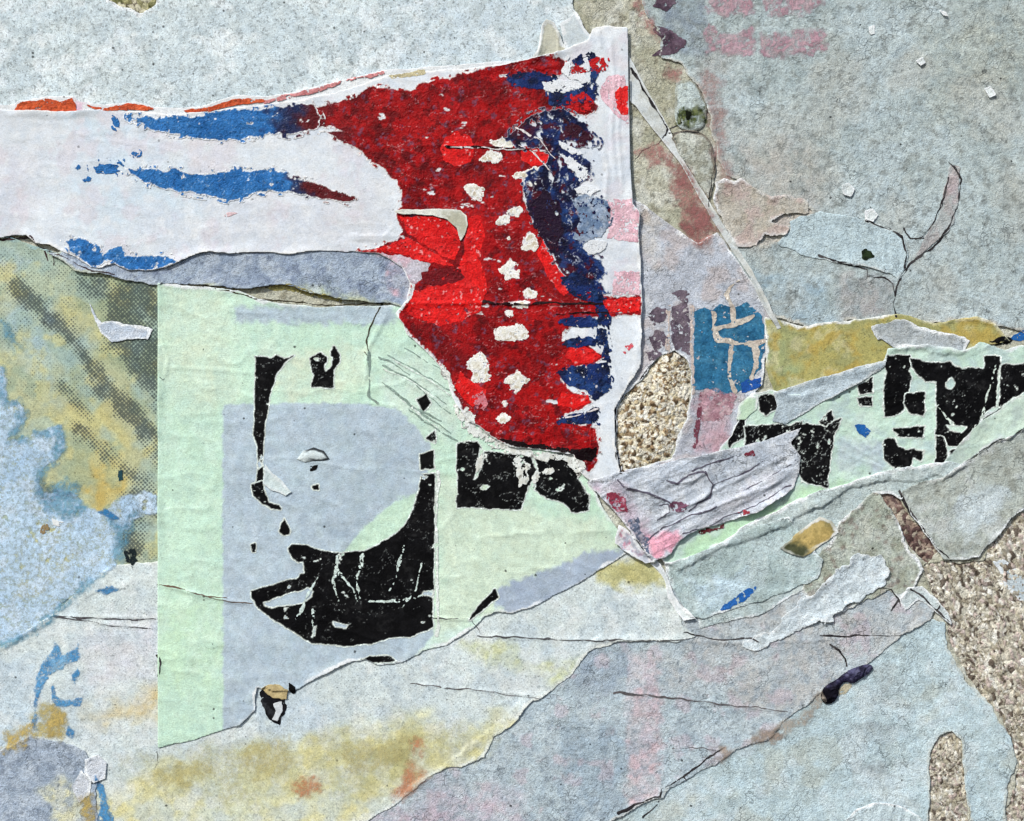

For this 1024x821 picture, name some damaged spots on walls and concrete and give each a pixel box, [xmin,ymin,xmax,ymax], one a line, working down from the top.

spalling [616,351,691,472]
peeling [615,525,657,563]
crack [410,683,550,699]
crack [613,691,788,712]
spalling [880,494,1024,821]
crack [617,747,725,818]